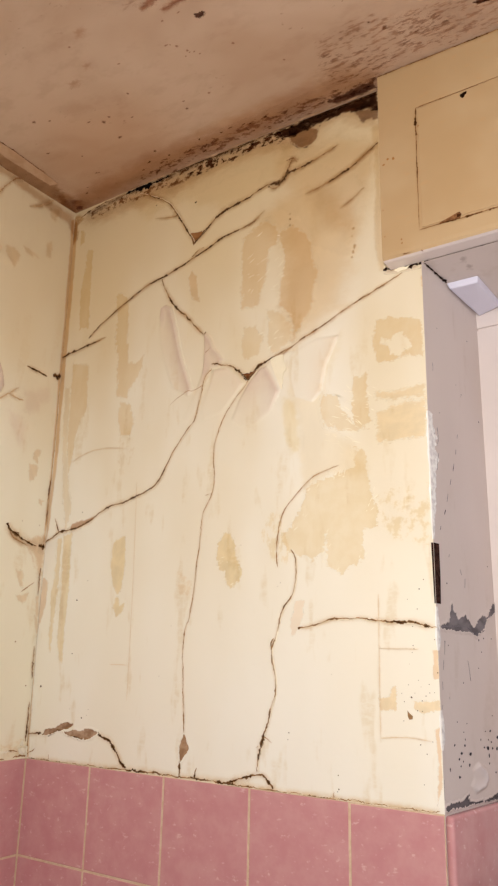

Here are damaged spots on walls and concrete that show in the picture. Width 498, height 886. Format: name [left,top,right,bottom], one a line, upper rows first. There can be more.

water stain [92,81,378,216]
crack [169,30,495,175]
crack [424,241,497,283]
peeling [371,315,425,365]
crack [6,142,401,732]
peeling [281,446,379,576]
peeling [320,370,495,680]
crack [25,465,445,813]